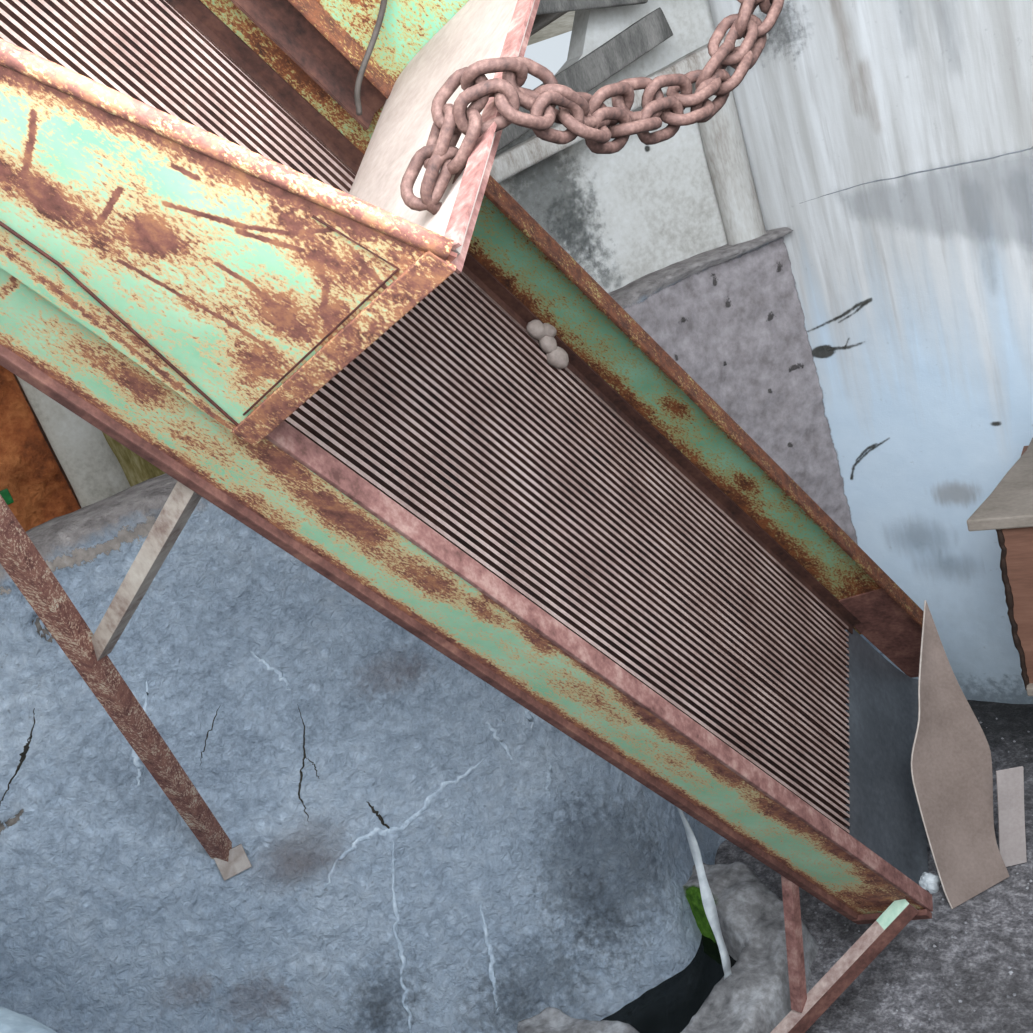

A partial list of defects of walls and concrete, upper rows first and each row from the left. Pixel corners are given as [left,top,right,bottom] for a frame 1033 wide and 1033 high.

crack [799,148,1033,204]
crack [0,708,35,806]
crack [297,704,320,822]
flaking render [0,809,24,834]